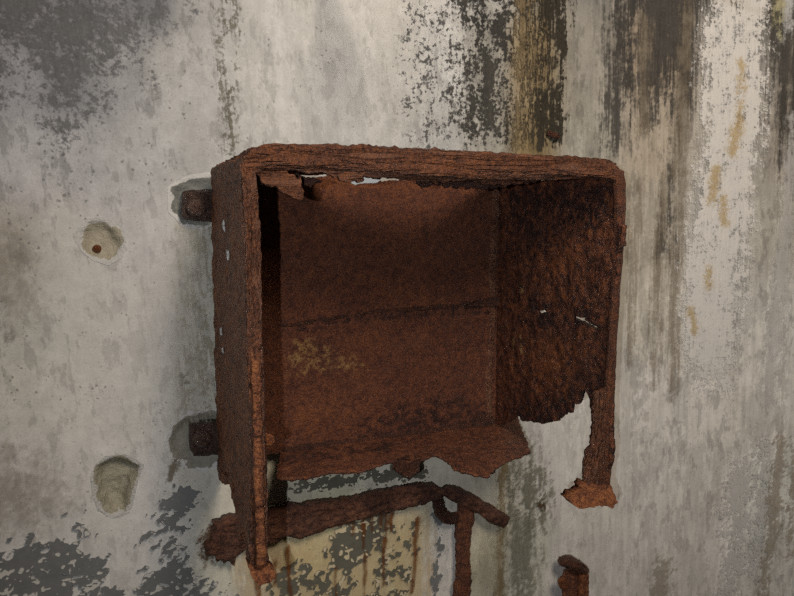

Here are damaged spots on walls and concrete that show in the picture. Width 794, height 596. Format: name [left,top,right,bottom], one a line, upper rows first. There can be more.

water stain [398,0,575,154]
spalling [76,217,126,265]
spalling [167,172,212,229]
water stain [599,0,794,406]
peeling [0,409,240,596]
peeling [288,464,429,500]
peeling [258,513,422,596]
corrosion [352,512,394,596]
corrosion [411,517,419,594]
peeling [430,512,445,596]
corrosion [557,554,589,596]